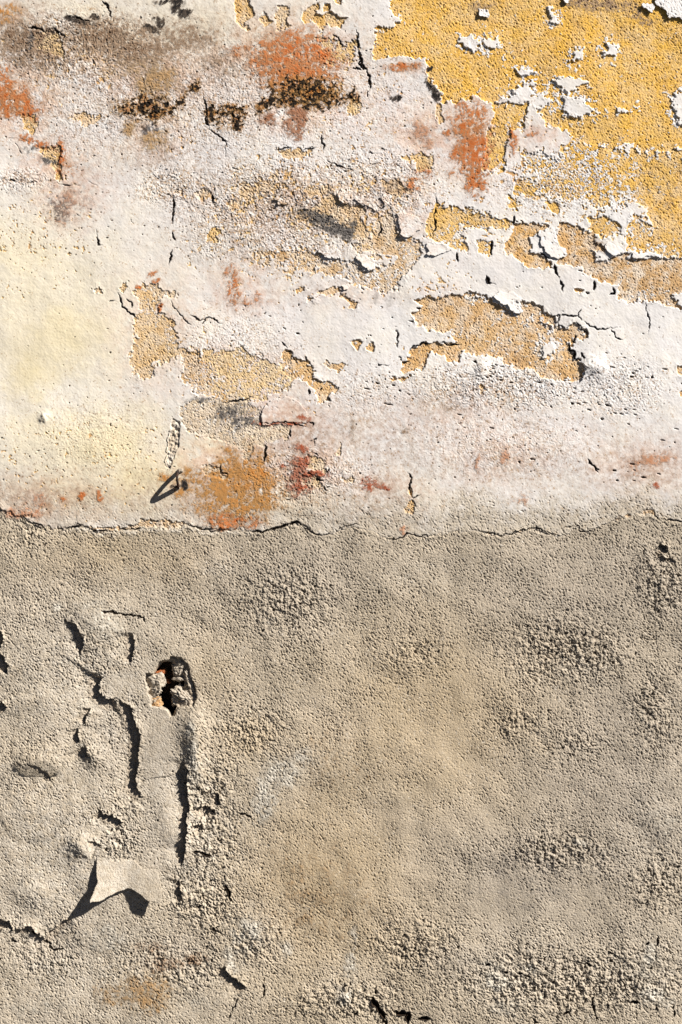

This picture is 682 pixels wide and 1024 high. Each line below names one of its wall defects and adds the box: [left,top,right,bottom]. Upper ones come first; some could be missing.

rust [0,64,44,123]
damp [204,72,360,131]
rust [228,27,348,141]
rust [406,168,431,192]
rust [412,99,494,199]
peeling [228,0,682,310]
peeling [119,280,348,469]
peeling [364,287,635,425]
rust [159,444,330,532]
crack [253,521,358,535]